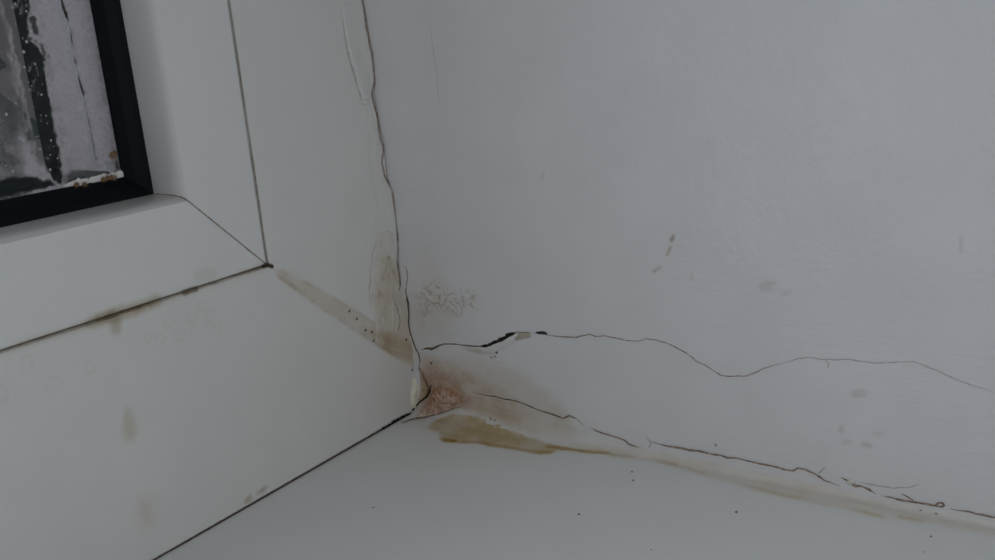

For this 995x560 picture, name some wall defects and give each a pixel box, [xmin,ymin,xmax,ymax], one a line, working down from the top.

crack [359,0,989,391]
crack [473,392,995,522]